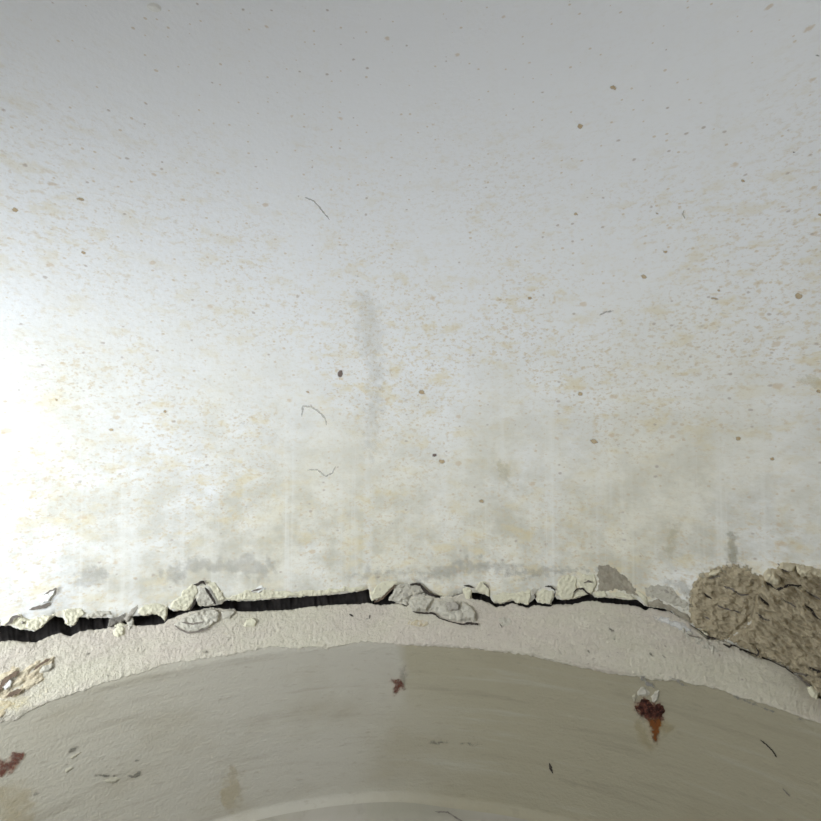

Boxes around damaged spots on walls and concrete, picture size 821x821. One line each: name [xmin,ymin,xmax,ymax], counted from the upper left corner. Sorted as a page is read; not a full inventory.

peeling [1,581,398,637]
crack [0,581,478,642]
peeling [408,593,434,627]
crack [464,585,674,614]
spalling [463,562,821,699]
spalling [0,656,55,718]
crack [691,625,820,694]
corrosion [635,697,665,742]
corrosion [0,752,24,777]